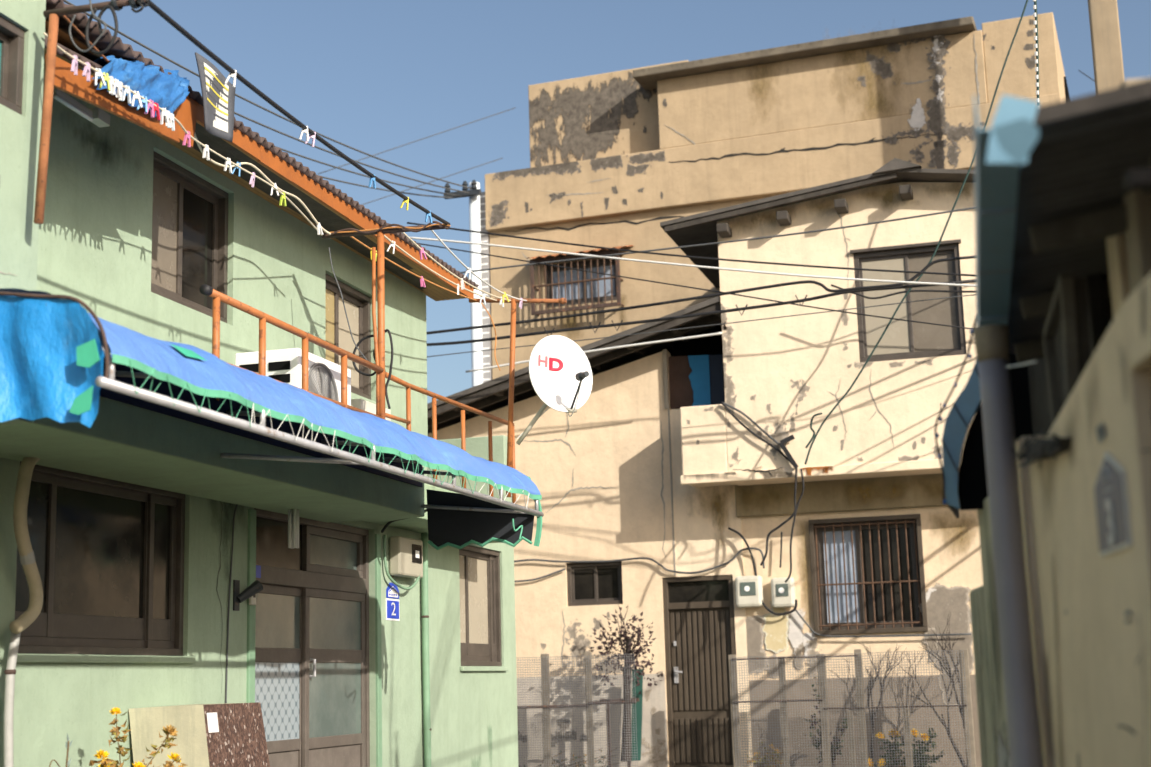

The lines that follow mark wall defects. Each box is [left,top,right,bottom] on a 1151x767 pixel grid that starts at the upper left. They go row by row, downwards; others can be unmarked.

peeling [492,72,668,211]
crack [664,124,937,163]
peeling [857,34,985,169]
peeling [486,200,509,227]
peeling [549,192,583,218]
peeling [704,304,810,479]
crack [828,375,894,451]
crack [524,414,614,513]
crack [659,423,667,557]
water stain [940,520,972,545]